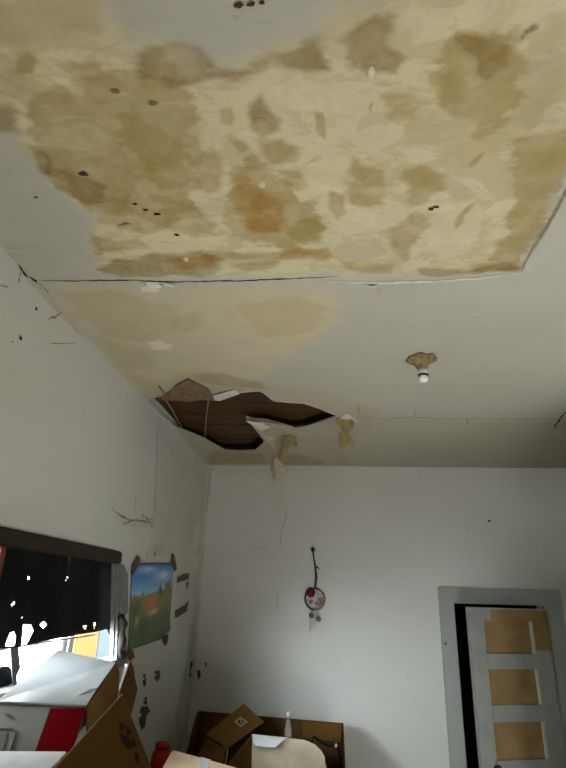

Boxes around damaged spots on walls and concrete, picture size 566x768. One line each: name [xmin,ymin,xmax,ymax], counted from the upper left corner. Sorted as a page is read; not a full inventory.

leakage [0,0,566,383]
crack [1,181,566,295]
flaking render [213,389,240,401]
flaking render [246,421,269,431]
crack [110,500,153,529]
peeling [141,671,160,688]
peeling [137,697,150,731]